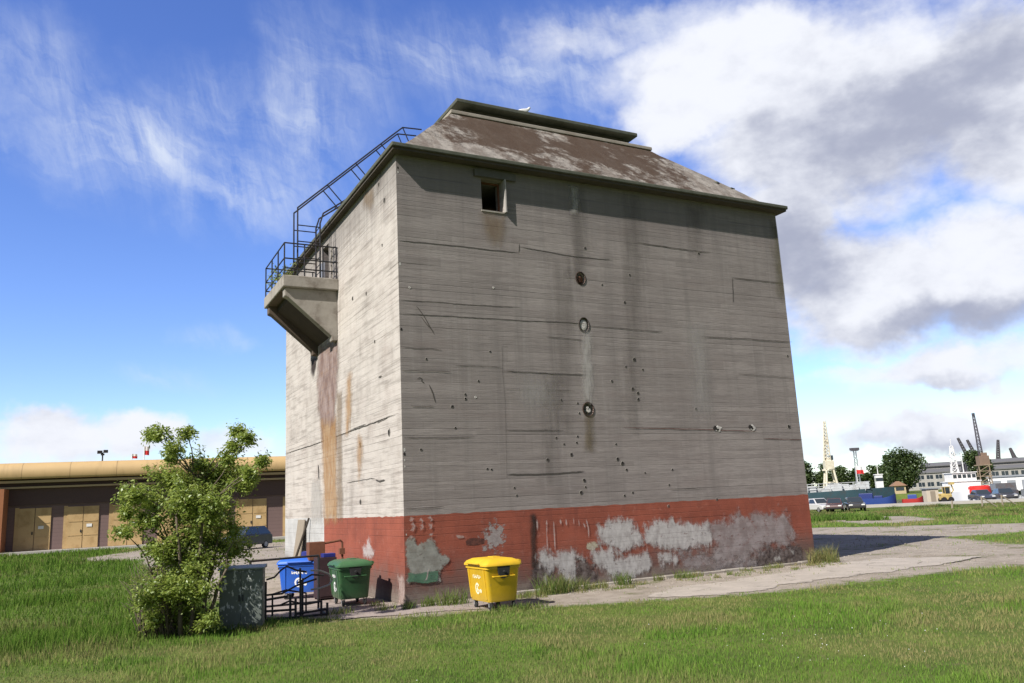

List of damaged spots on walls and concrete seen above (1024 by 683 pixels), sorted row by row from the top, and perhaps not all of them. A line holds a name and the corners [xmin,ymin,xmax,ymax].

corrosion [317,342,351,520]
peeling [398,534,450,605]
peeling [456,522,506,554]
peeling [529,504,802,590]